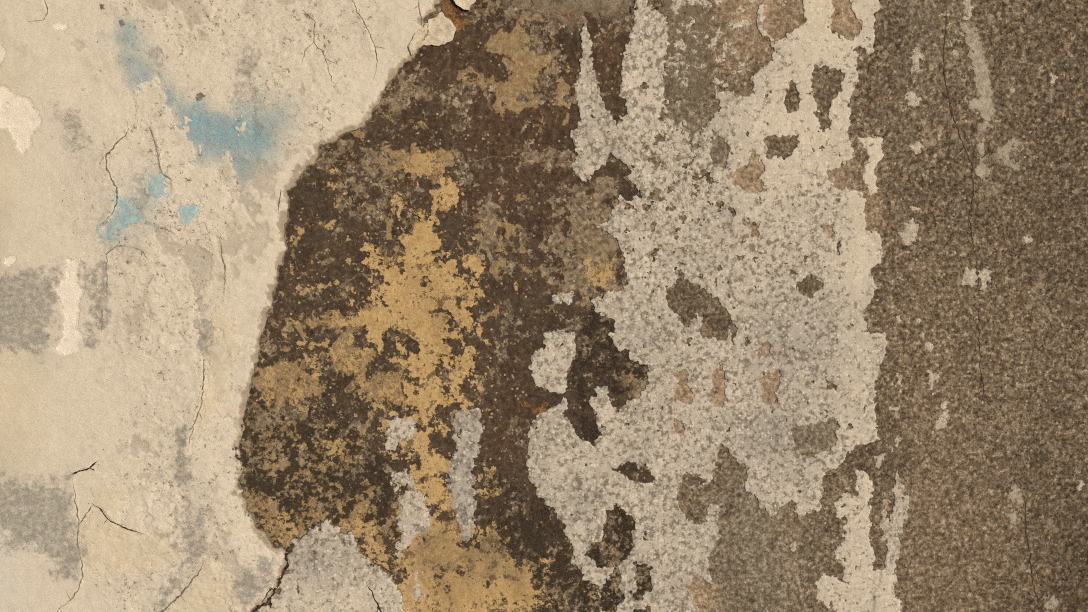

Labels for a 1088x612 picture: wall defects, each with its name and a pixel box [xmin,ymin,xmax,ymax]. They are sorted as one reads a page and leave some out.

crack [302,11,339,93]
crack [352,0,382,76]
peeling [0,86,42,153]
peeling [239,0,911,612]
crack [57,462,142,611]
crack [155,564,203,612]